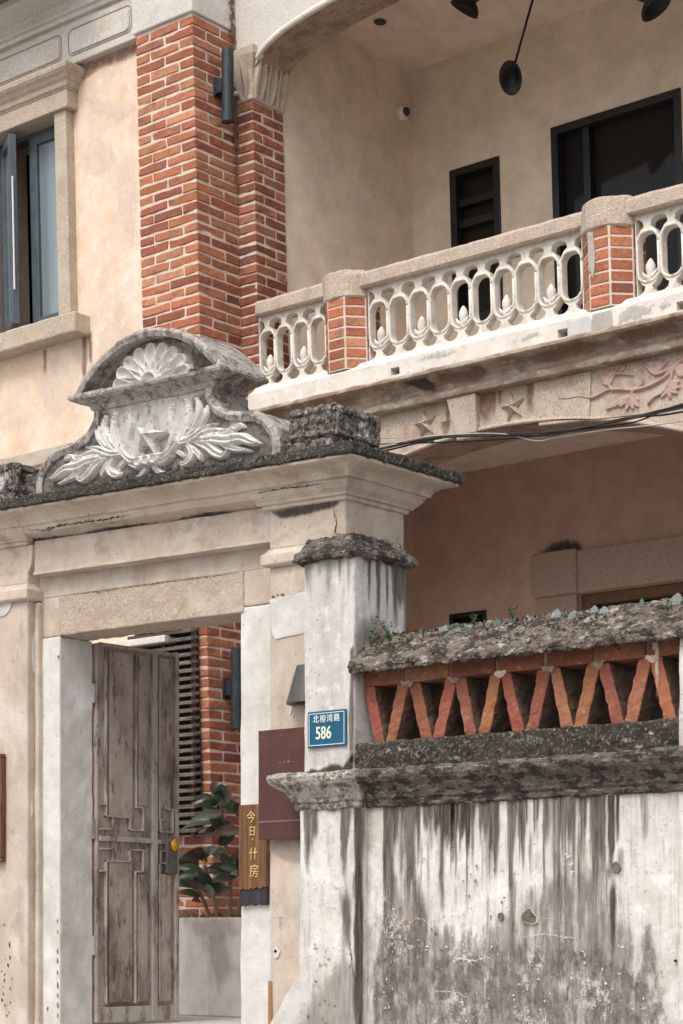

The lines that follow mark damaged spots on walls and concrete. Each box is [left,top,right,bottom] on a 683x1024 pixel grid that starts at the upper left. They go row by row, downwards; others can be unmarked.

leakage [350,560,406,660]
leakage [307,795,664,1024]
spalling [490,897,538,925]